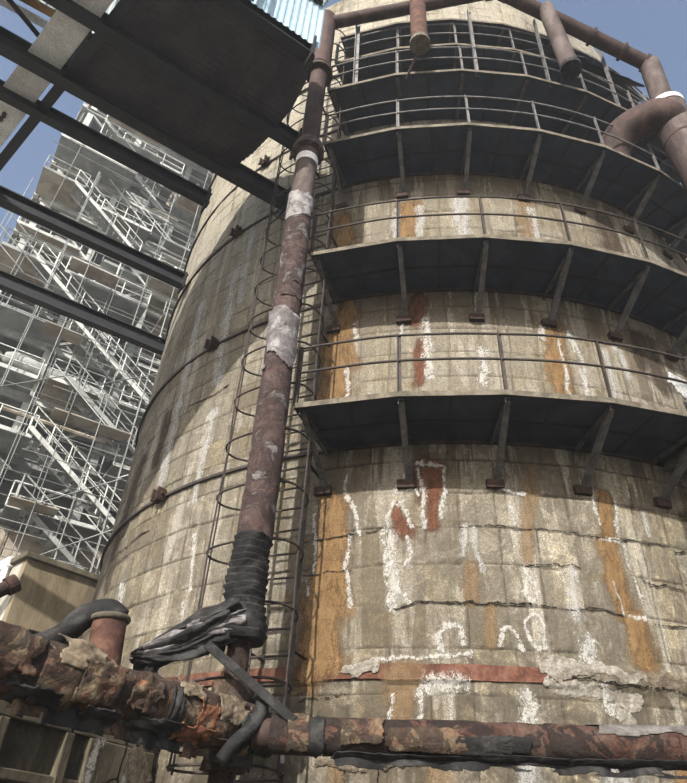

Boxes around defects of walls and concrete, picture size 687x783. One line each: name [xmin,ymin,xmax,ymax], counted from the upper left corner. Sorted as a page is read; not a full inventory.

spalling [667,372,687,407]
corrosion [412,455,445,531]
damp [381,460,448,613]
crack [455,524,687,554]
corrosion [290,492,355,696]
peeling [339,657,380,677]
damp [377,622,473,661]
crack [392,600,624,616]
damp [498,567,548,652]
peeling [539,654,687,725]
corrosion [595,488,661,674]
crack [571,677,687,696]